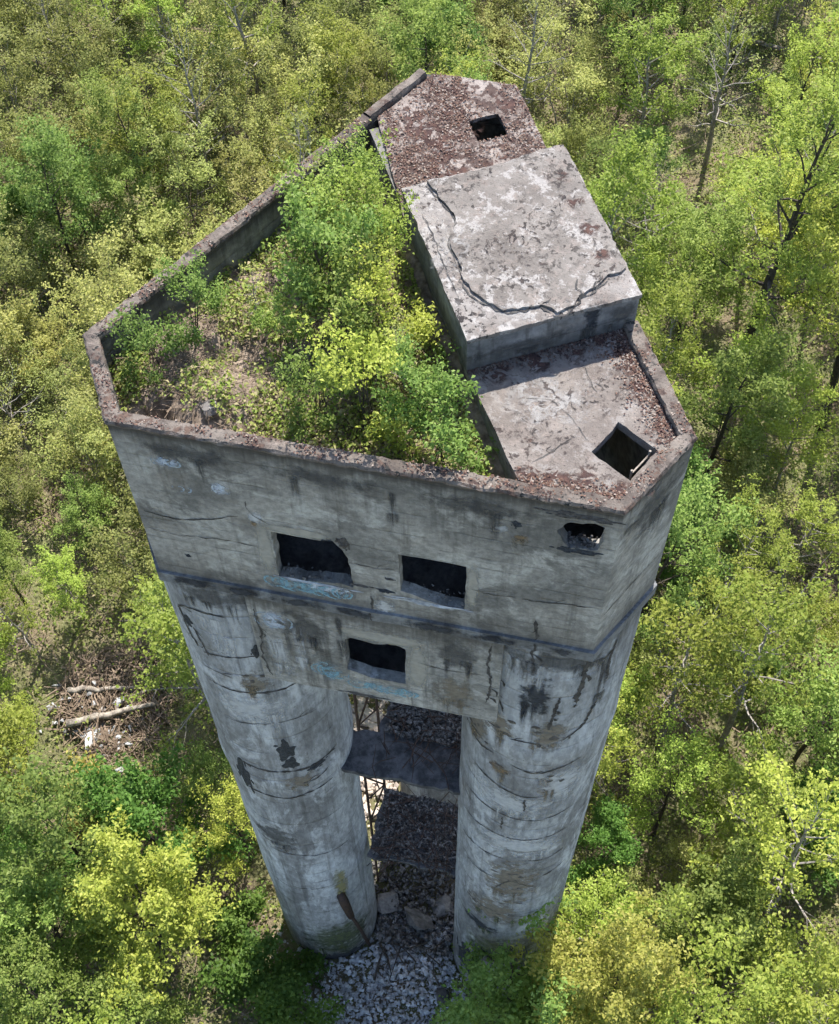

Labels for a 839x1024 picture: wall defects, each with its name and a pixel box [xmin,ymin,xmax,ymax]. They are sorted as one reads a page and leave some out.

crack [418,187,615,317]
crack [178,604,336,695]
water stain [475,636,609,719]